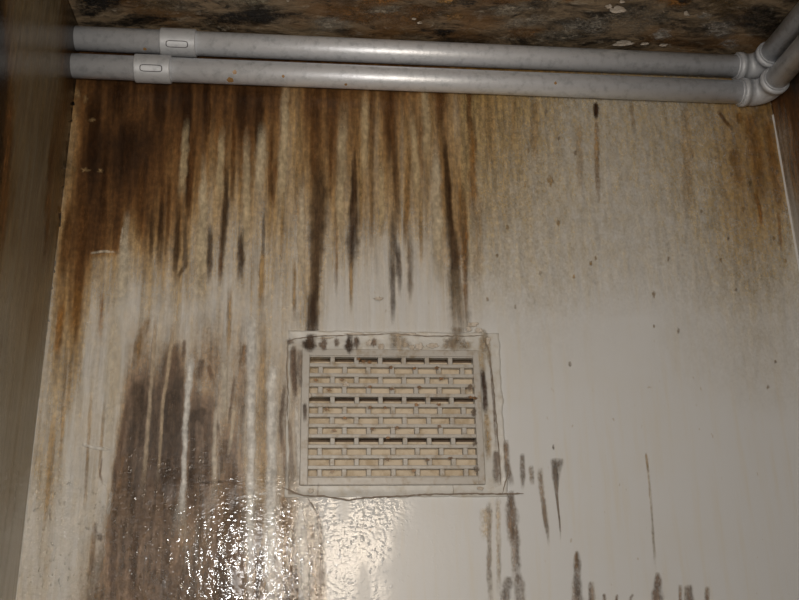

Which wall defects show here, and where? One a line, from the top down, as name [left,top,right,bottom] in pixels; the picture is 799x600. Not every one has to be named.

leakage [202,0,290,24]
rust [80,48,147,56]
rust [197,56,732,85]
rust [34,70,799,512]
leakage [481,370,511,480]
leakage [84,322,323,600]
leakage [521,456,548,532]
leakage [552,461,561,528]
leakage [484,495,523,600]
leakage [573,553,605,600]
leakage [653,575,661,600]